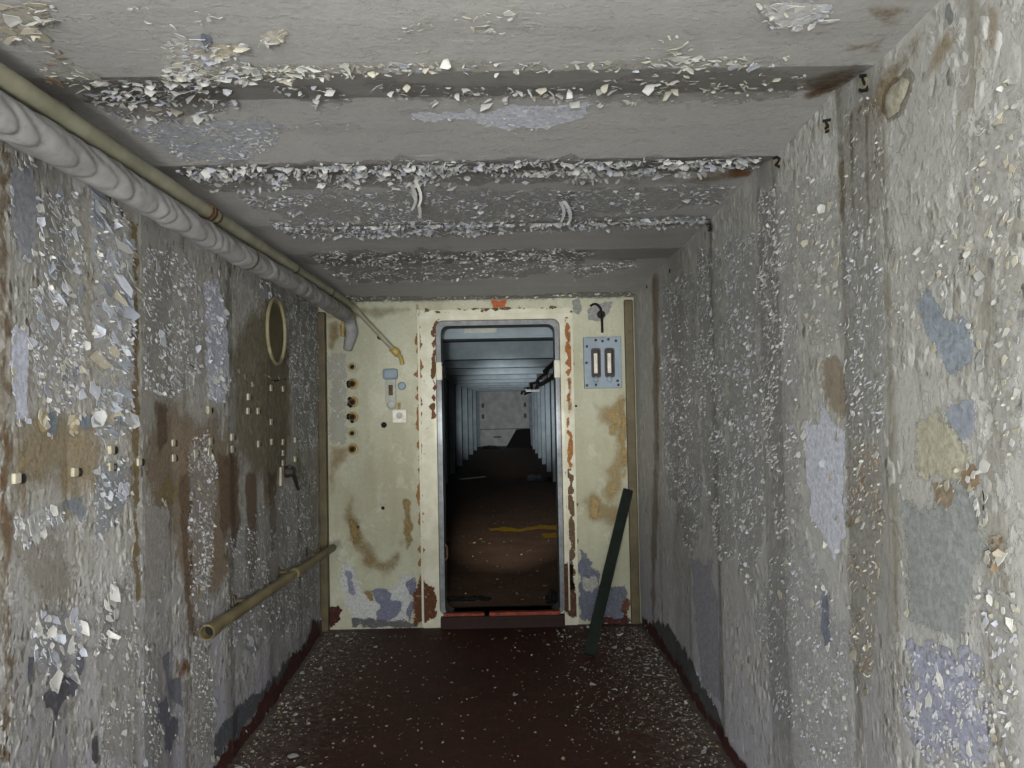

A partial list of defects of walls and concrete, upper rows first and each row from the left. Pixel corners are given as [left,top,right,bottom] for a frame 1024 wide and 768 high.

peeling [9,155,231,442]
peeling [14,277,347,768]
leakage [233,308,289,491]
peeling [339,563,418,629]
peeling [0,3,806,322]
corrosion [412,299,580,626]
peeling [578,549,628,621]
peeling [645,617,726,737]
leakage [807,72,850,97]
peeling [659,76,1020,768]